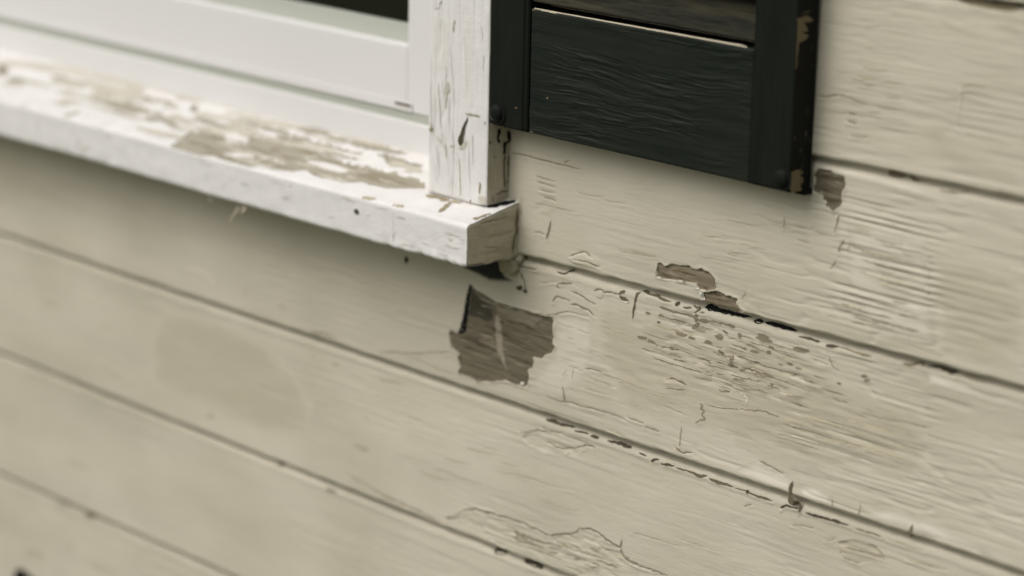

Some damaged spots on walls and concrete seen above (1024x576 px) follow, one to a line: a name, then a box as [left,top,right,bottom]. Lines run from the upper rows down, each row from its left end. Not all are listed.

peeling [89,94,425,189]
peeling [814,169,846,211]
peeling [450,285,554,386]
crack [429,7,946,576]
peeling [656,263,742,312]